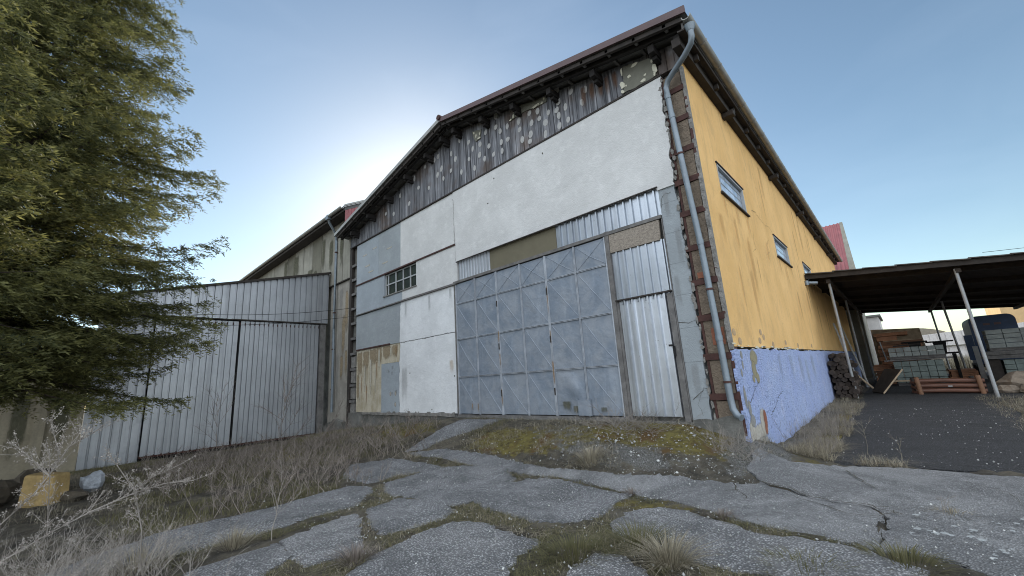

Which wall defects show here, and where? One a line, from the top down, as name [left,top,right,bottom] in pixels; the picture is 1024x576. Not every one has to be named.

peeling [619,58,677,180]
flaking render [732,329,825,442]
crack [726,470,971,520]